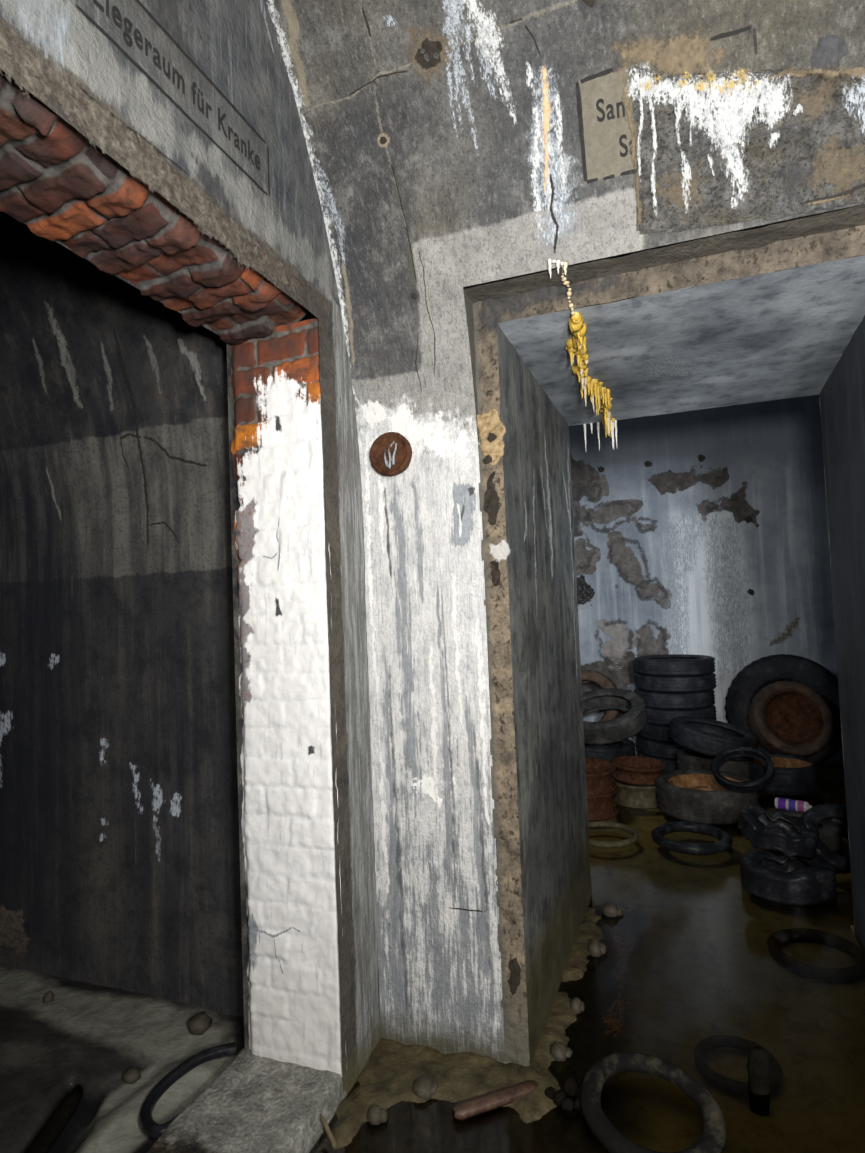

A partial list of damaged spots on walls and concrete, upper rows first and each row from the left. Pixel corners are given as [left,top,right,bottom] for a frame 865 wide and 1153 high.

crack [299,0,412,115]
efflorescence [442,0,516,155]
efflorescence [526,63,575,253]
leakage [613,30,803,214]
efflorescence [843,76,865,134]
flaking render [570,453,672,609]
flaking render [645,455,760,527]
flaking render [581,620,670,693]
leakage [383,482,424,996]
leakage [436,591,452,886]
leakage [465,698,491,974]